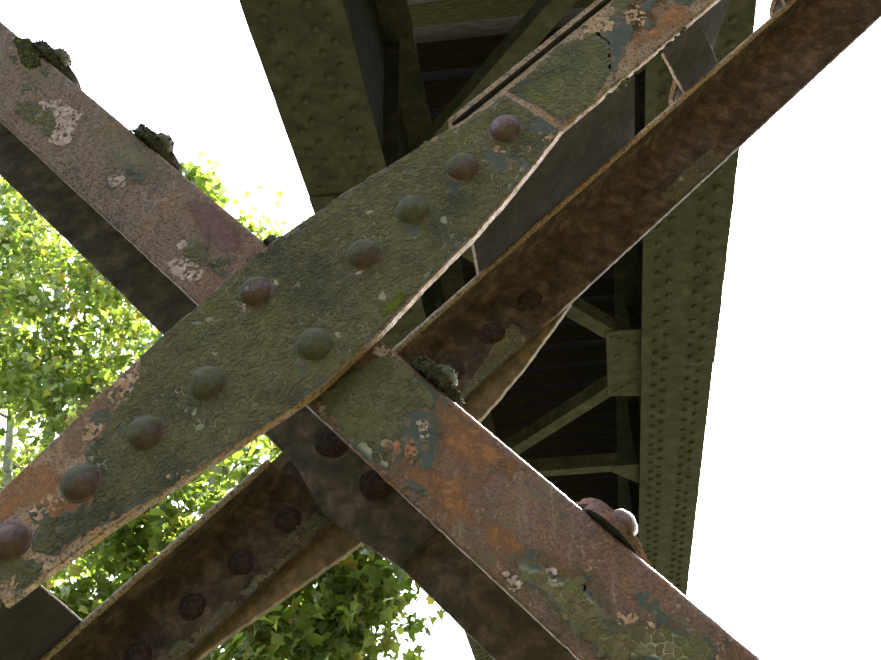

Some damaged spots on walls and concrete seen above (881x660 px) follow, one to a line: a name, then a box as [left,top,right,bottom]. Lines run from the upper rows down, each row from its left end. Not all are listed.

peeling [661,149,719,201]
peeling [0,0,656,589]
peeling [502,548,722,660]